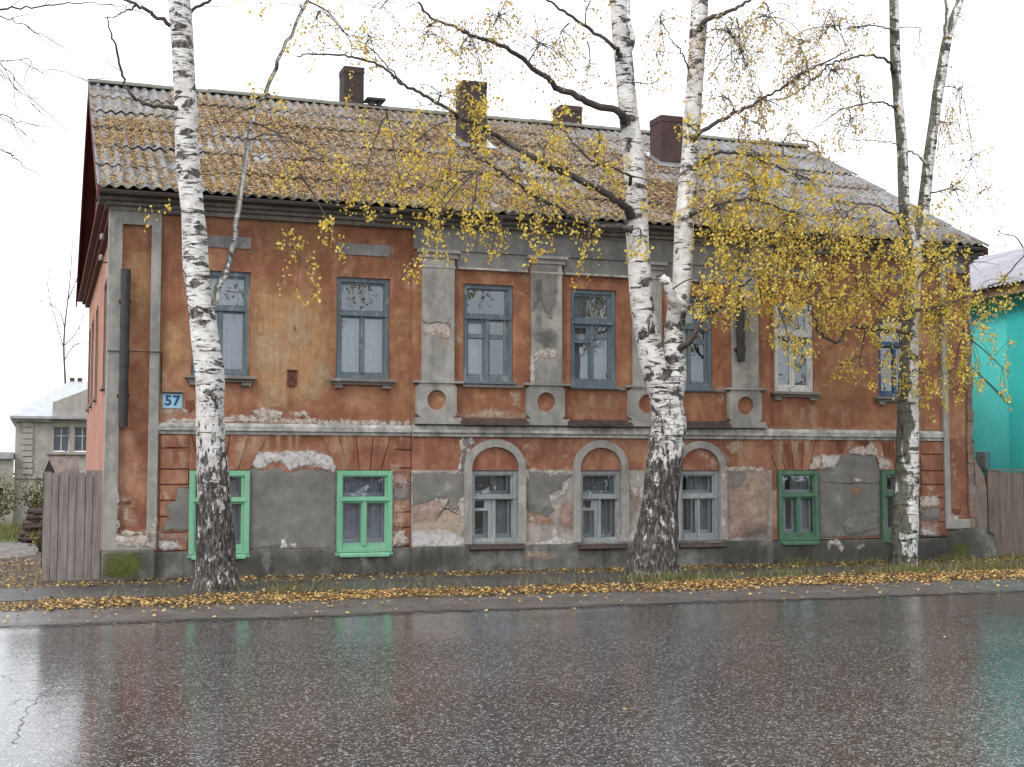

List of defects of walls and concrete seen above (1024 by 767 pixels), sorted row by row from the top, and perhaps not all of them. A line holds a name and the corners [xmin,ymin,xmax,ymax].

flaking render [160,391,196,423]
peeling [224,283,410,425]
flaking render [422,322,462,351]
spalling [919,263,976,536]
flaking render [115,486,189,551]
flaking render [248,450,337,550]
flaking render [392,437,475,547]
flaking render [526,468,576,544]
flaking render [810,441,892,538]